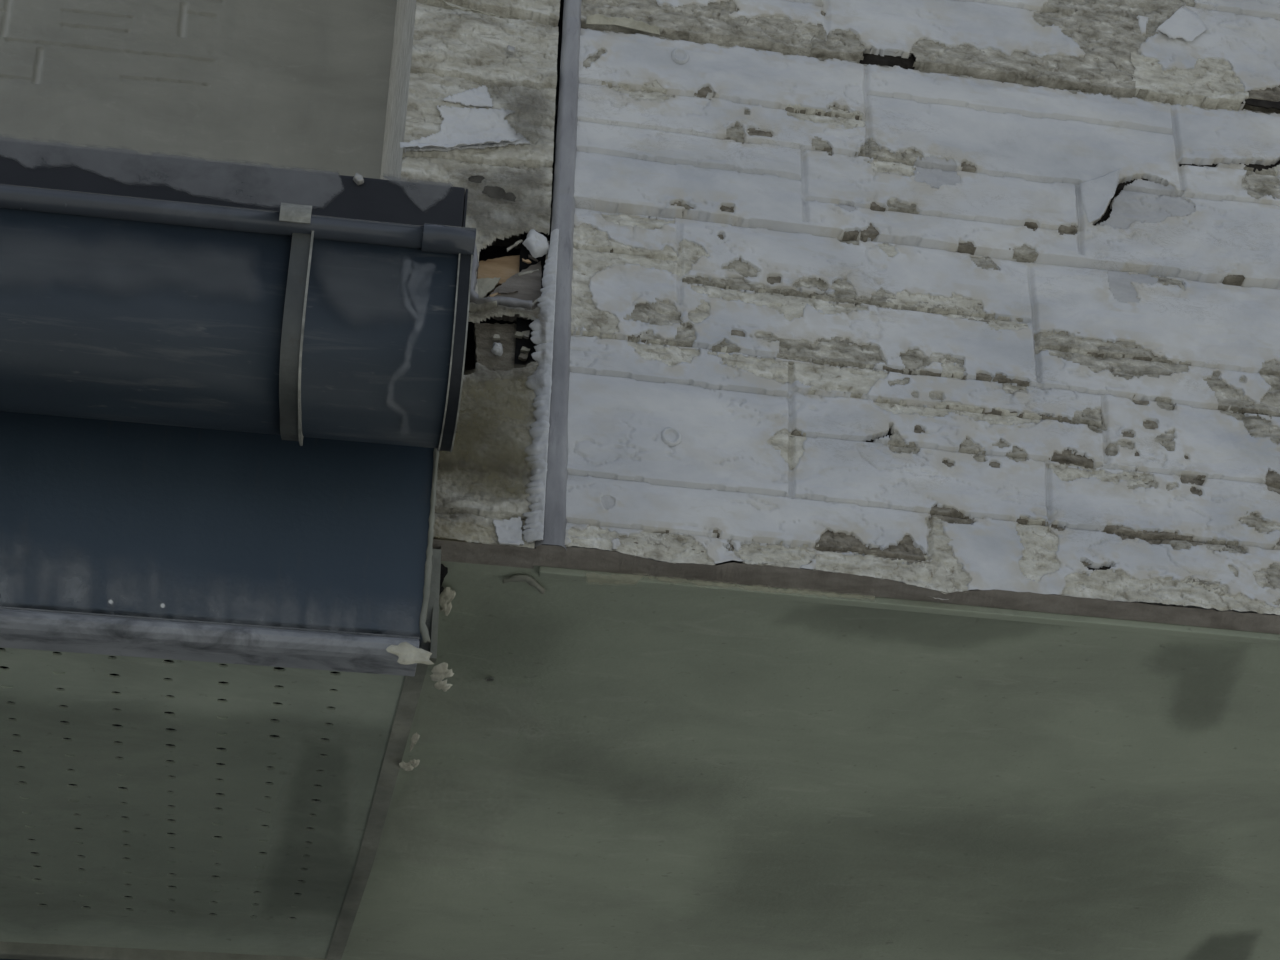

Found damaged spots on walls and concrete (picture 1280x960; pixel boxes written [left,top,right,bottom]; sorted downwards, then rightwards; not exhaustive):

peeling [581,0,1280,115]
peeling [400,85,530,153]
peeling [785,104,976,188]
peeling [1058,168,1195,235]
peeling [1179,160,1280,199]
spalling [464,229,549,375]
peeling [571,198,1206,496]
peeling [1203,359,1280,445]
peeling [492,516,524,546]
peeling [566,526,715,565]
peeling [811,505,976,594]
peeling [1015,511,1280,615]